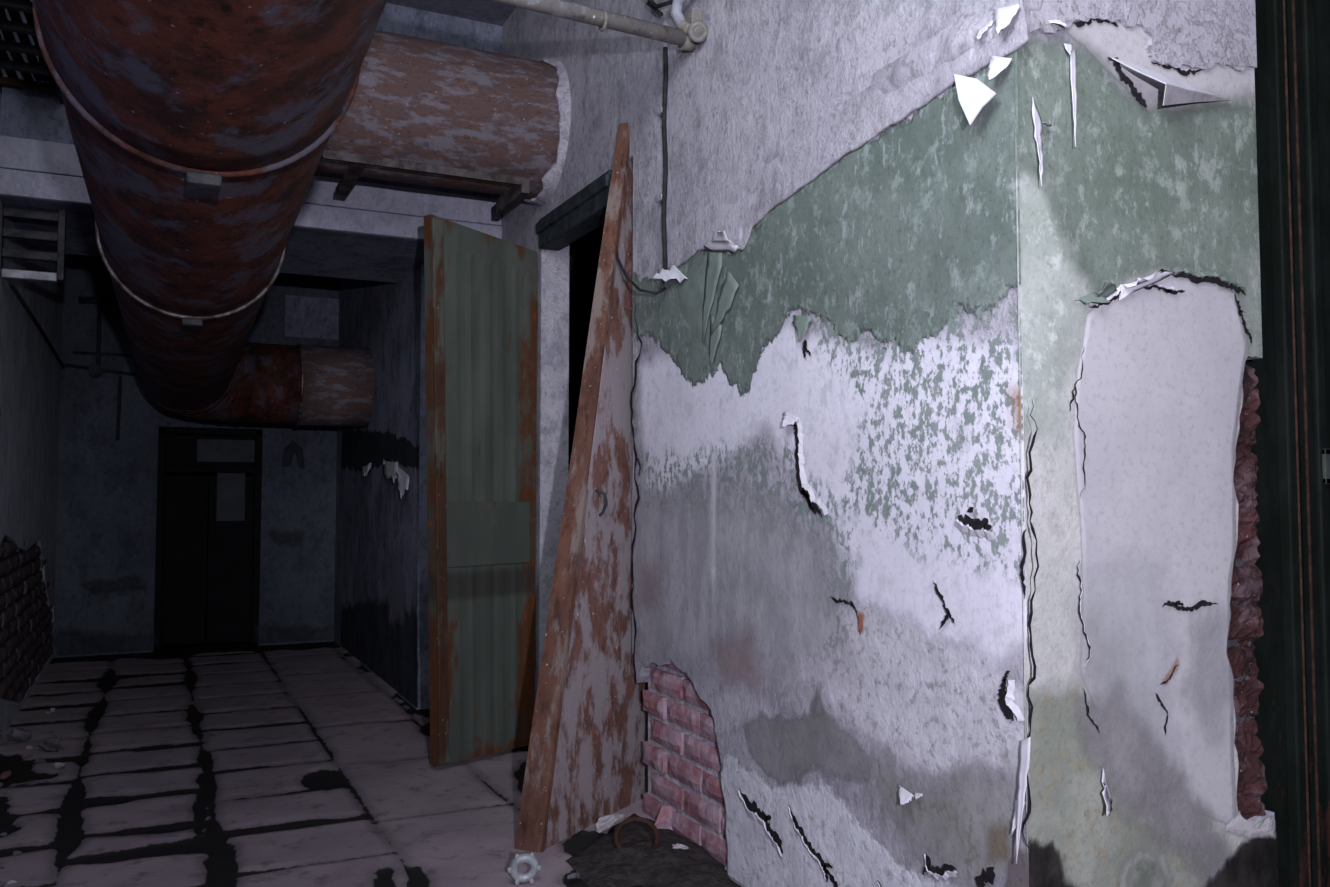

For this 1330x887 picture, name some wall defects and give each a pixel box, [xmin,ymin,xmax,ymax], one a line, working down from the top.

peeling [633,0,1275,887]
spalling [0,535,53,703]
crack [1163,600,1218,612]
crack [737,789,838,887]
leakage [744,687,1073,887]
leakage [1082,694,1279,887]